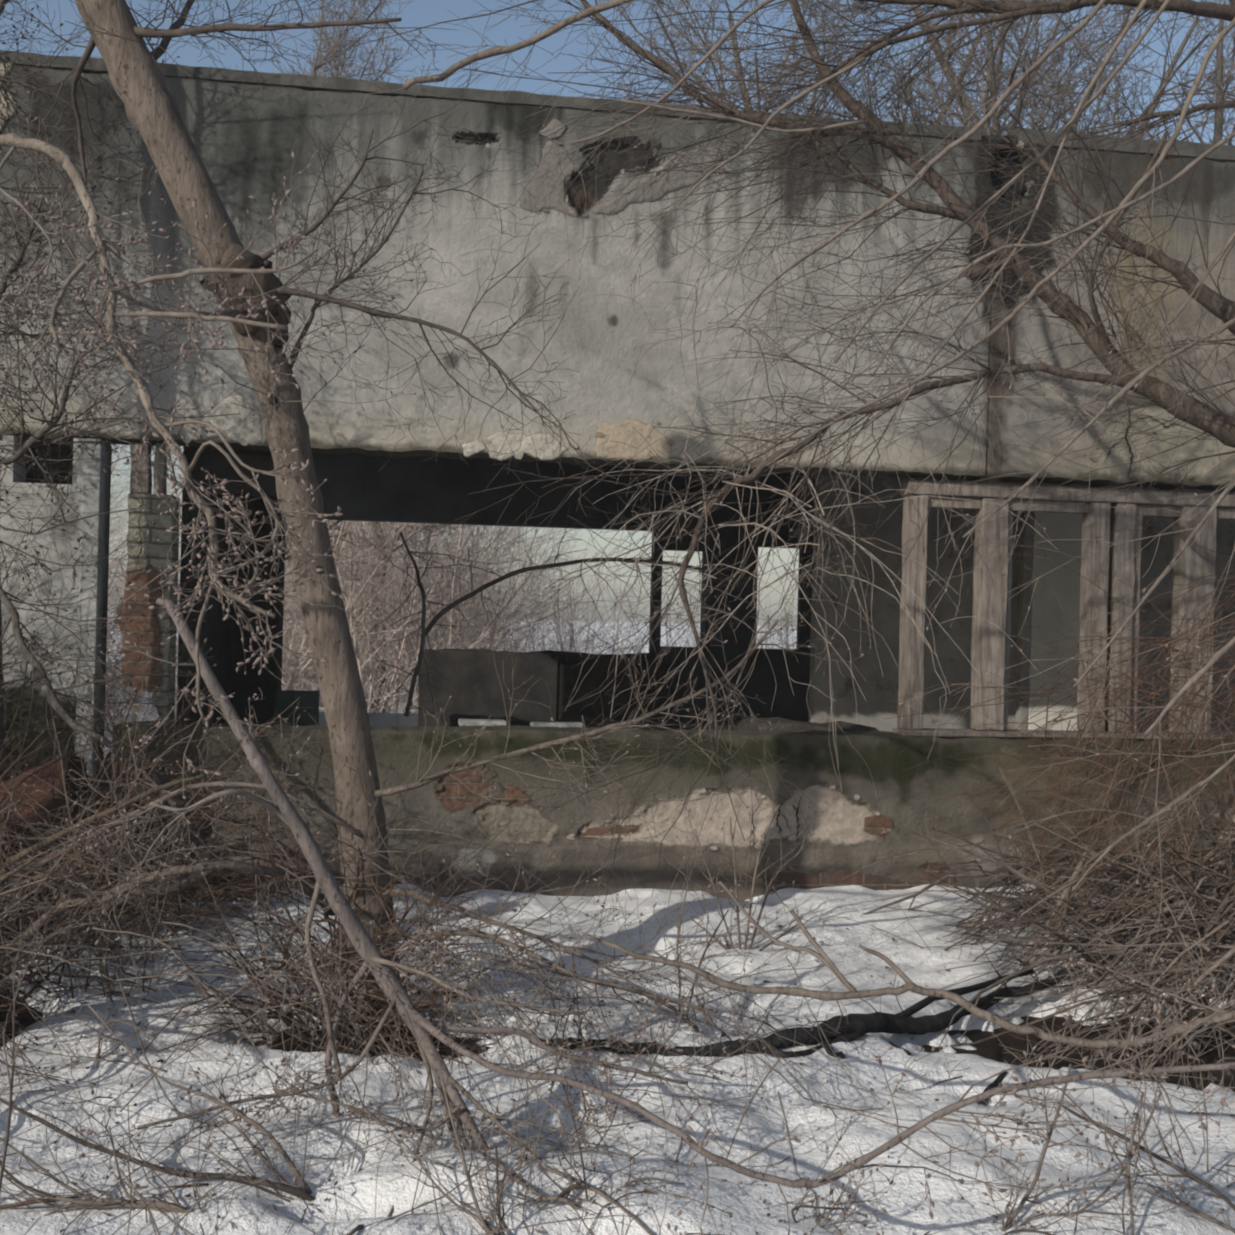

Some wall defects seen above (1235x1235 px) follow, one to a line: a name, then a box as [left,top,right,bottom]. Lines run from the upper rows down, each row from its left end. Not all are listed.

flaking render [519,118,723,218]
damp [966,137,1059,317]
spalling [462,430,578,460]
flaking render [595,419,675,461]
spalling [113,565,163,691]
spalling [434,762,893,850]